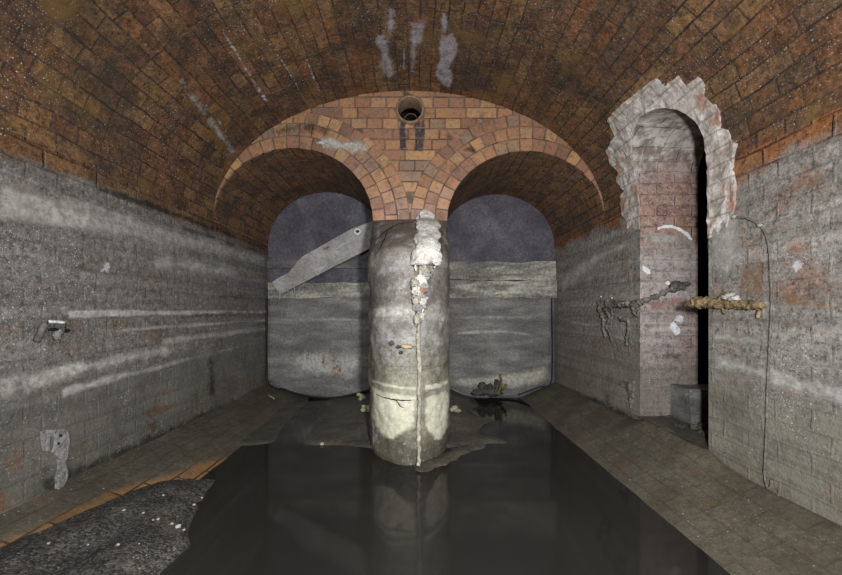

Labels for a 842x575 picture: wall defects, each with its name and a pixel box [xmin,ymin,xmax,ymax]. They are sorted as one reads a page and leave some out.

efflorescence [376,9,394,76]
efflorescence [436,15,457,86]
efflorescence [316,137,367,153]
peeling [606,76,738,267]
damp [0,309,266,399]